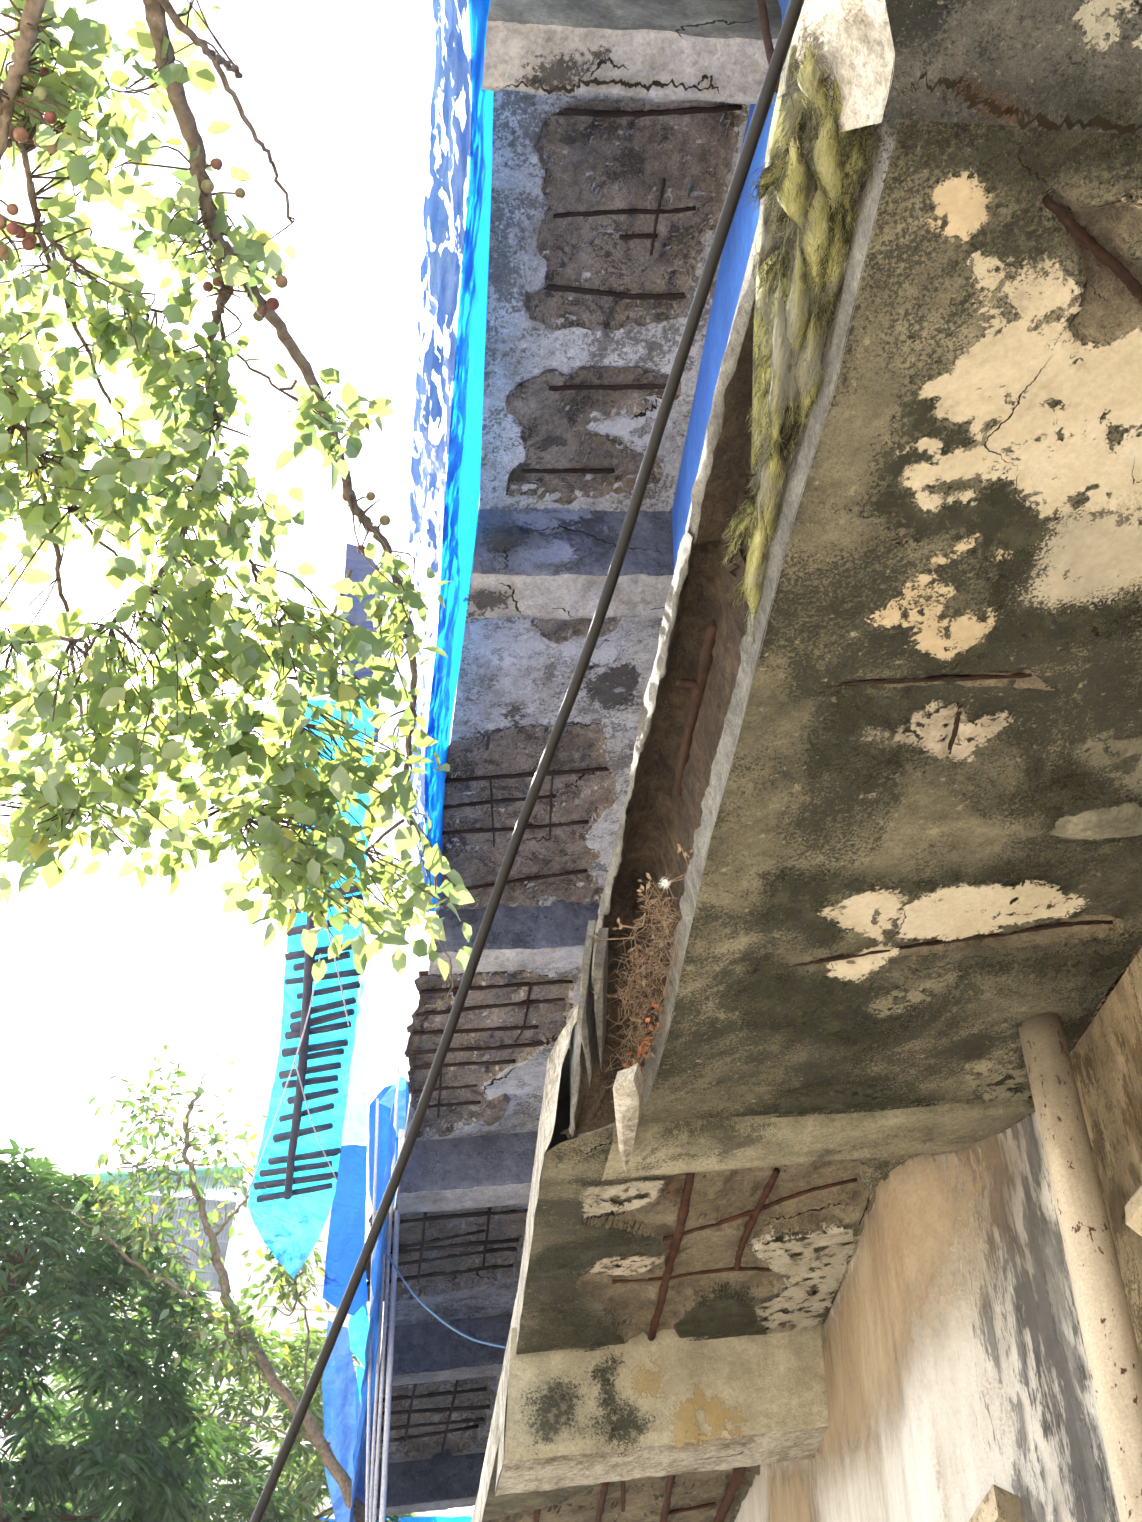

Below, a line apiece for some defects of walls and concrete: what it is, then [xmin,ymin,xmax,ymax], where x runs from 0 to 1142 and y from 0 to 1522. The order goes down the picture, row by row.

crack [496,56,720,95]
crack [676,17,759,38]
crack [899,70,1142,187]
spalling [404,0,903,1139]
peeling [823,167,1142,762]
damp [724,749,1142,1250]
peeling [786,880,1125,1021]
spalling [373,1376,497,1459]
spalling [366,1205,528,1302]
mould [518,1217,664,1465]
spalling [491,1159,873,1522]
damp [766,1113,1119,1522]